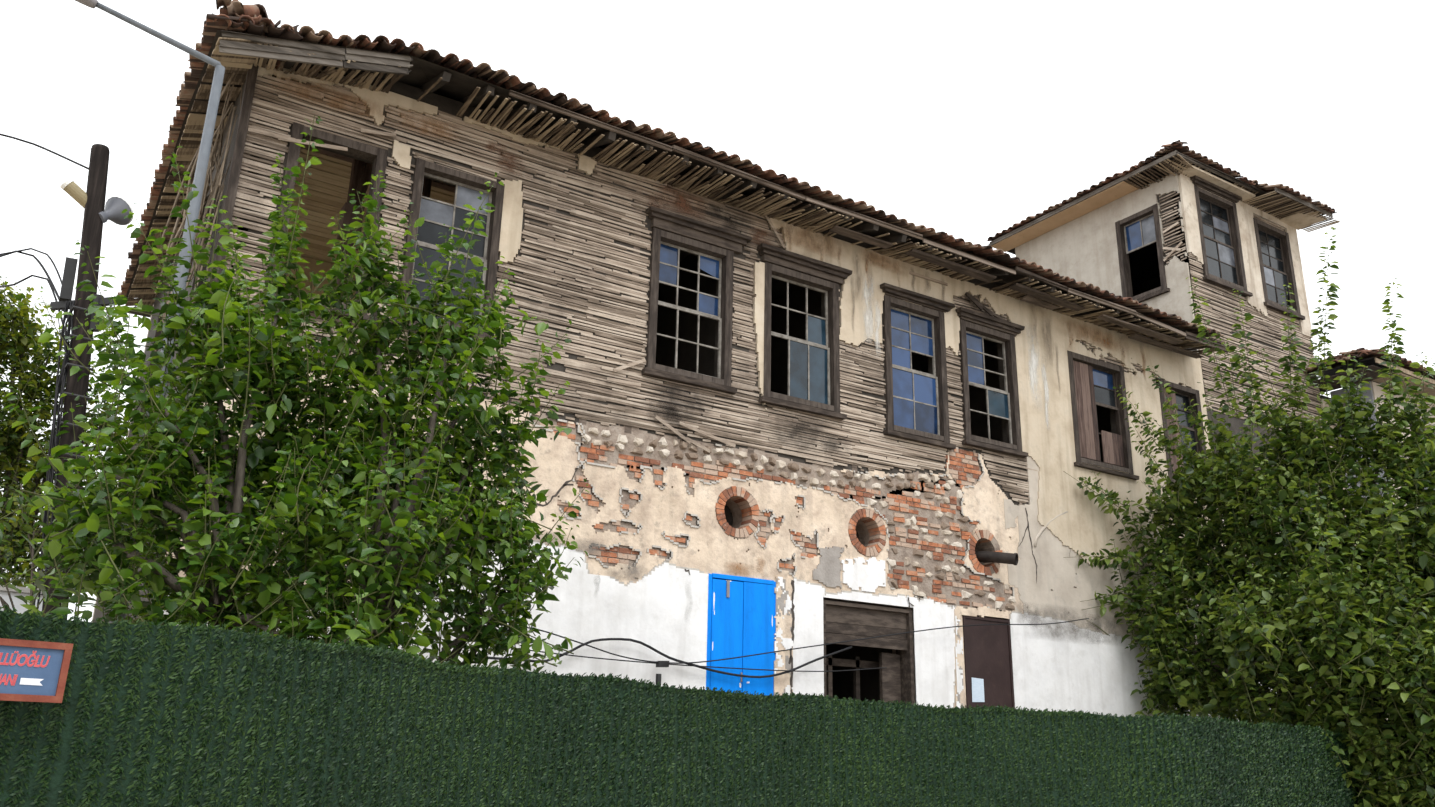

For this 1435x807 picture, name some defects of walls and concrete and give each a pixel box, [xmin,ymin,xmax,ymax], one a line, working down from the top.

flaking render [529,411,1133,708]